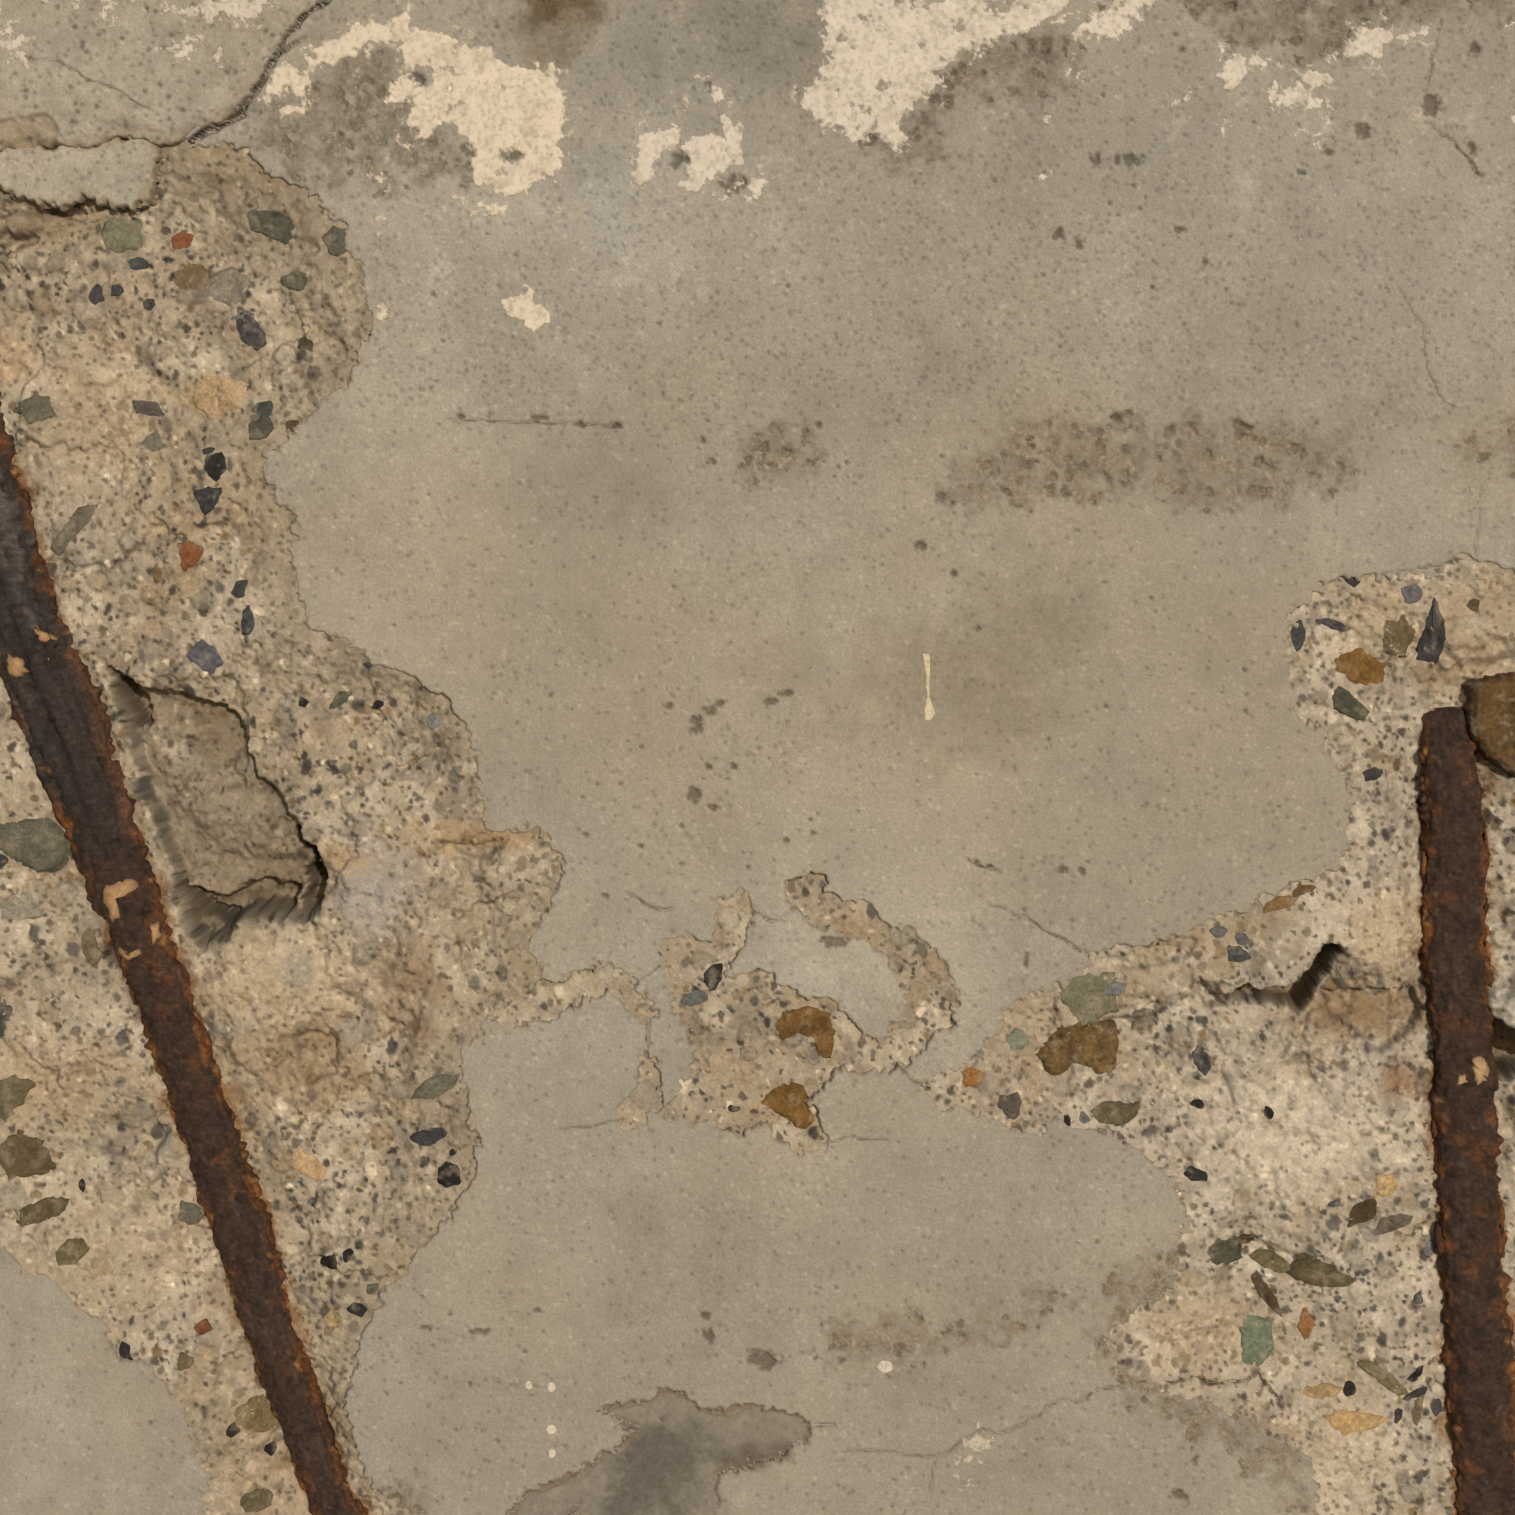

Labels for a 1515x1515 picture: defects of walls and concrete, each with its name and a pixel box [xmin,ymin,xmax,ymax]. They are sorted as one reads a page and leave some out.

crack [190,2,330,144]
peeling [790,0,1155,163]
peeling [1184,0,1436,150]
spalling [0,0,961,1515]
spalling [918,553,1515,1515]
water stain [611,1427,693,1515]
corrosion [1439,1417,1459,1515]